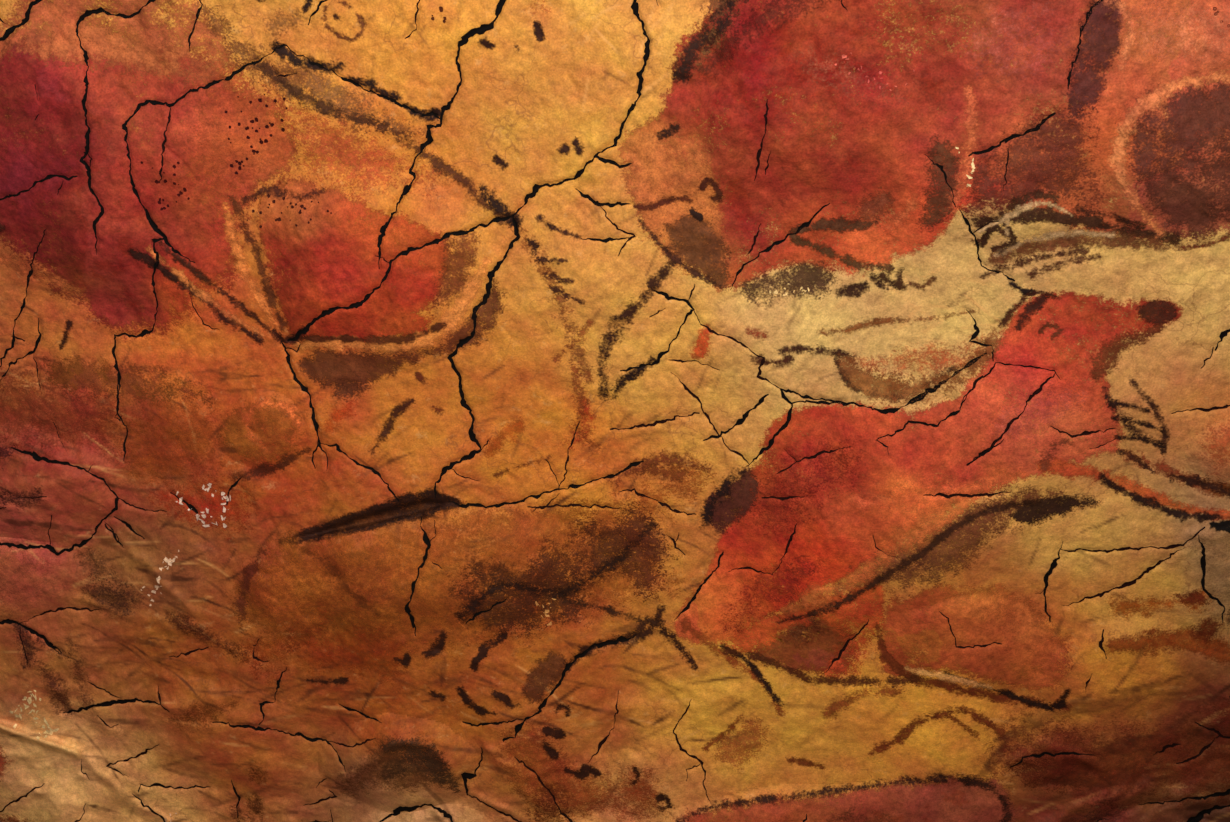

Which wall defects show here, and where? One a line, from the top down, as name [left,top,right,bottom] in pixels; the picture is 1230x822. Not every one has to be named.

crack [924,0,1103,281]
crack [730,203,830,290]
crack [0,0,696,636]
crack [1201,329,1230,368]
crack [610,285,1061,618]
crack [1035,527,1225,622]
crack [0,607,99,667]
crack [63,681,169,728]
crack [75,744,241,822]
crack [212,639,382,822]
crack [379,635,636,822]
crack [673,700,711,803]